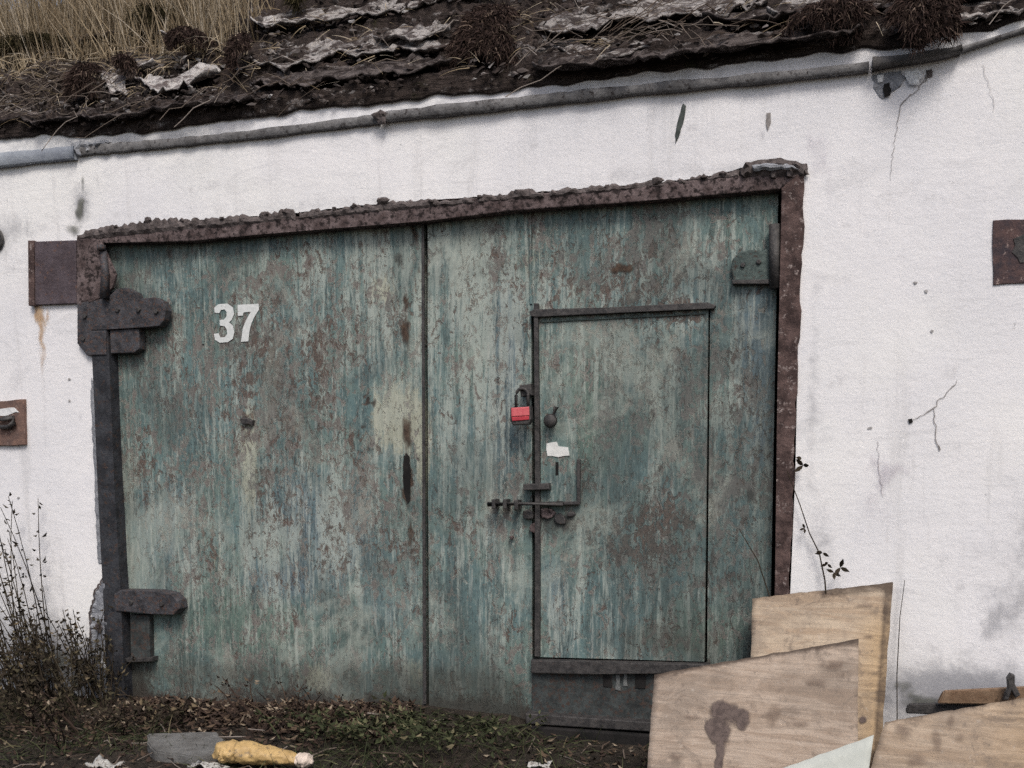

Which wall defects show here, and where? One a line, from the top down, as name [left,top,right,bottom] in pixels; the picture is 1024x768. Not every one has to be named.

spalling [872,68,923,99]
crack [890,69,932,180]
rust [612,264,632,272]
rust [35,307,43,338]
rust [401,321,409,343]
crack [908,381,957,450]
rust [402,420,413,504]
spalling [73,579,107,698]